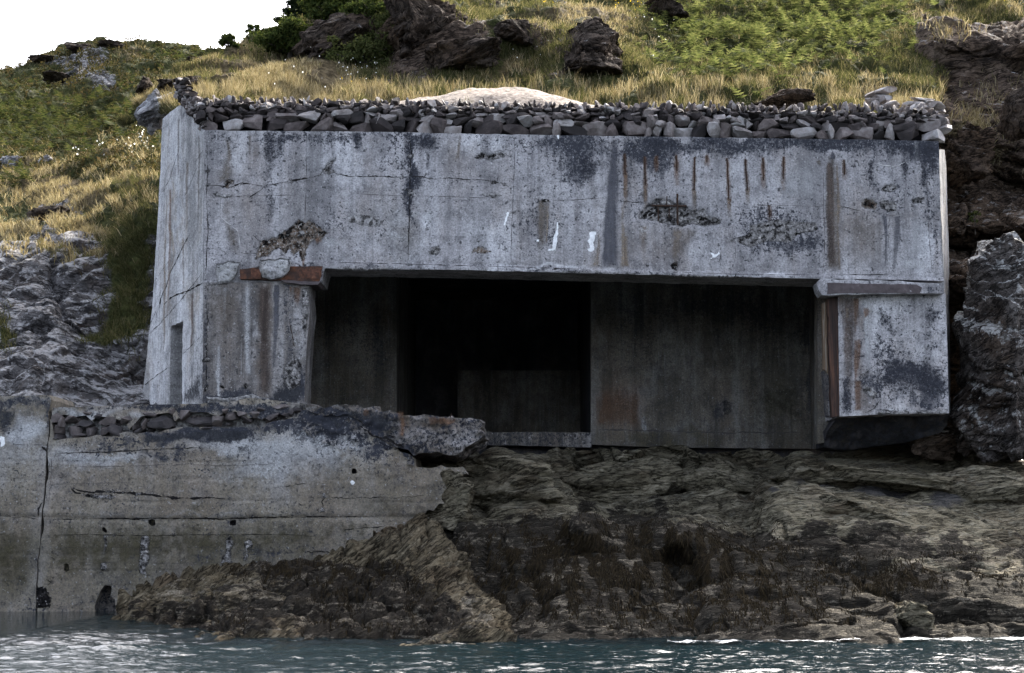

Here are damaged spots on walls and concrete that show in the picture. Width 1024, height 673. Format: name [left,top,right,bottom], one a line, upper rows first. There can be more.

water stain [587,142,618,264]
spalling [639,194,722,227]
spalling [255,219,328,265]
crack [145,146,509,385]
water stain [145,429,249,452]
crack [71,488,225,500]
spalling [36,587,51,608]